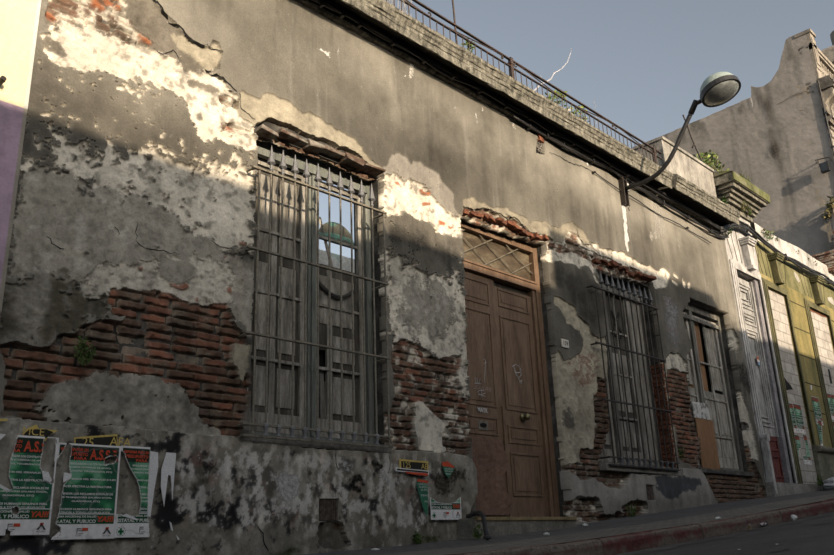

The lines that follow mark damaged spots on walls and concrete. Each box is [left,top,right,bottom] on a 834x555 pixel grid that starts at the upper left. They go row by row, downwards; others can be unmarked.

crack [154,0,223,58]
crack [205,70,254,119]
flaking render [0,0,691,492]
flaking render [655,348,767,503]
peeling [85,415,295,555]
spalling [317,470,384,553]
spalling [562,495,648,522]